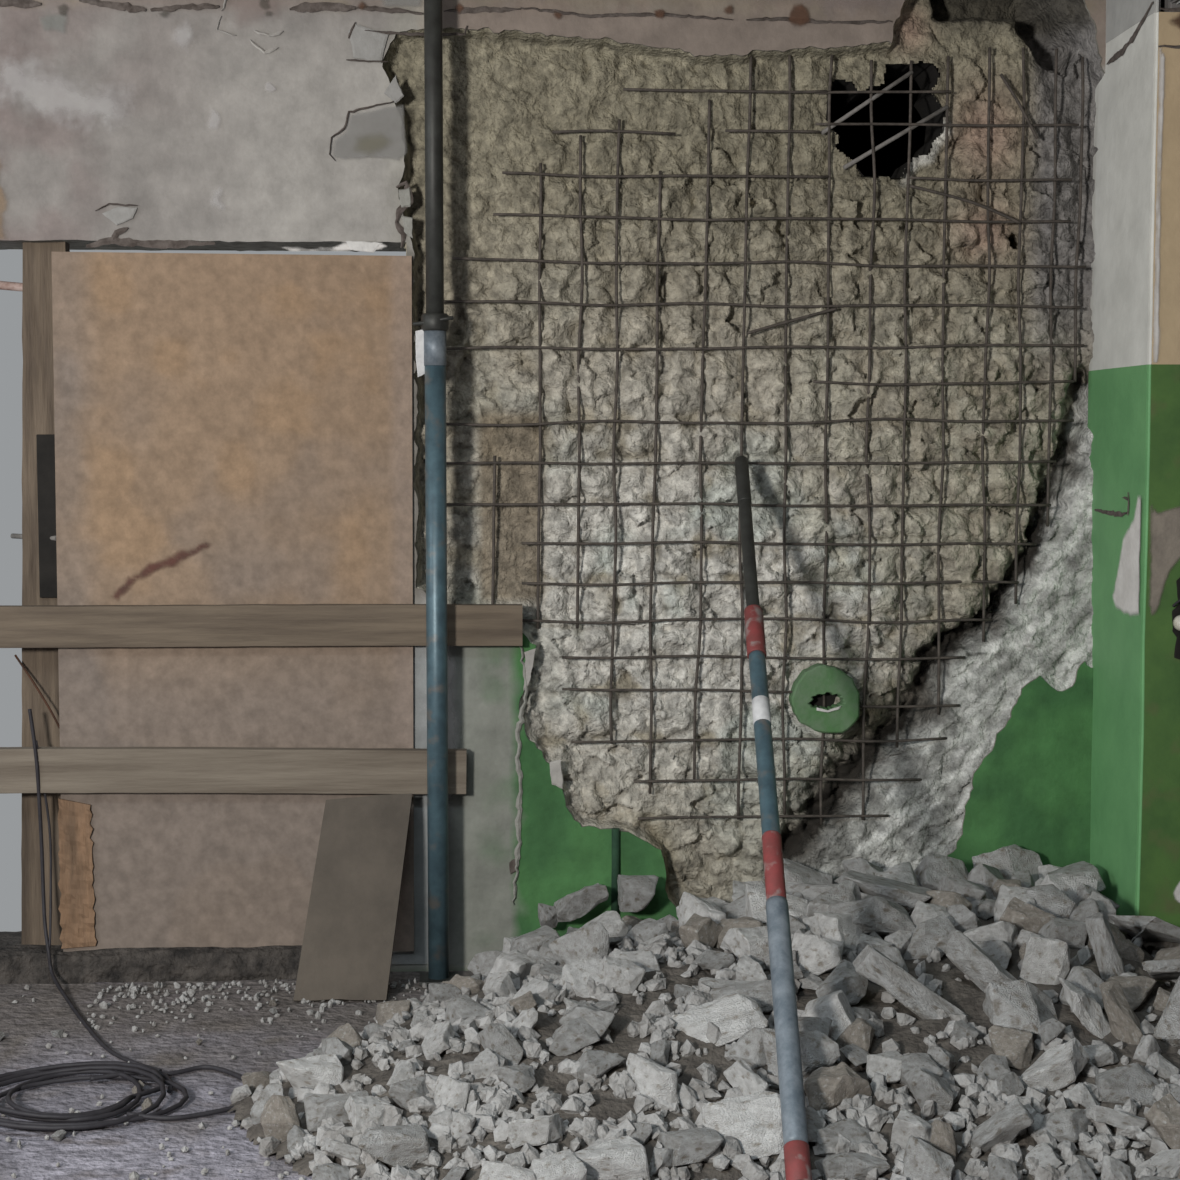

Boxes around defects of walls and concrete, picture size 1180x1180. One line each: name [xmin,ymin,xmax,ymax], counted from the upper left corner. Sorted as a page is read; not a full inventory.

crack [0,0,41,8]
crack [79,0,219,13]
crack [289,2,892,25]
flaking render [86,203,215,249]
spalling [329,22,426,593]
spalling [442,0,1104,907]
peeling [1113,498,1180,614]